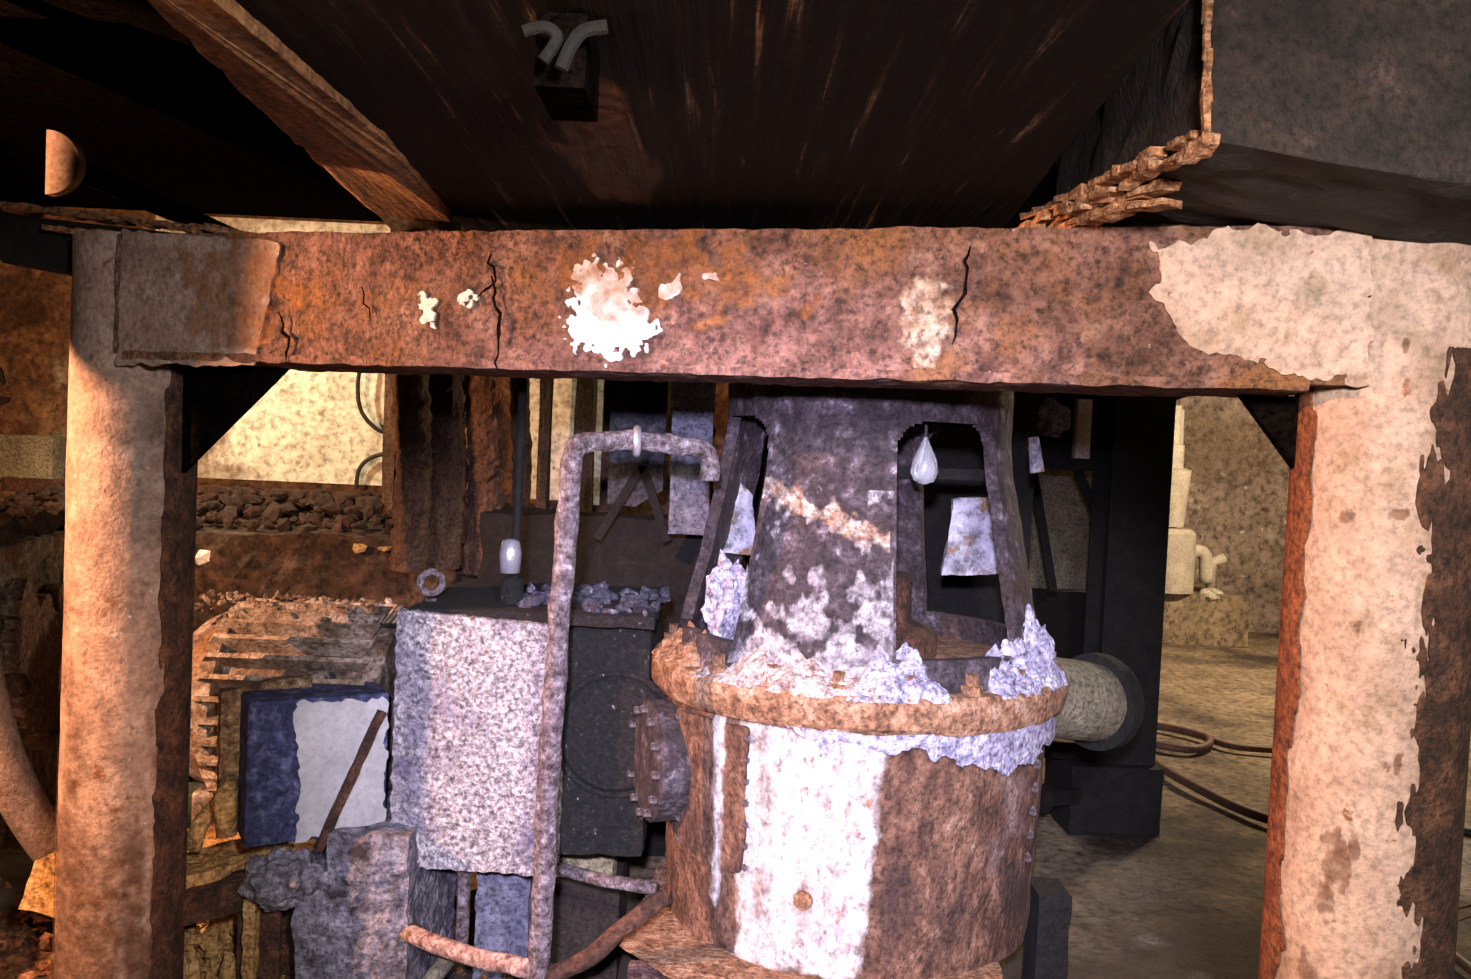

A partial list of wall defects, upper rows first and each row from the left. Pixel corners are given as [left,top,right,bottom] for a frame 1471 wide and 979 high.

crack [477,253,502,375]
rust [565,249,685,303]
crack [952,245,971,345]
peeling [1149,223,1376,388]
rust [1258,387,1318,979]
rust [1395,347,1471,979]
rust [1321,830,1360,898]